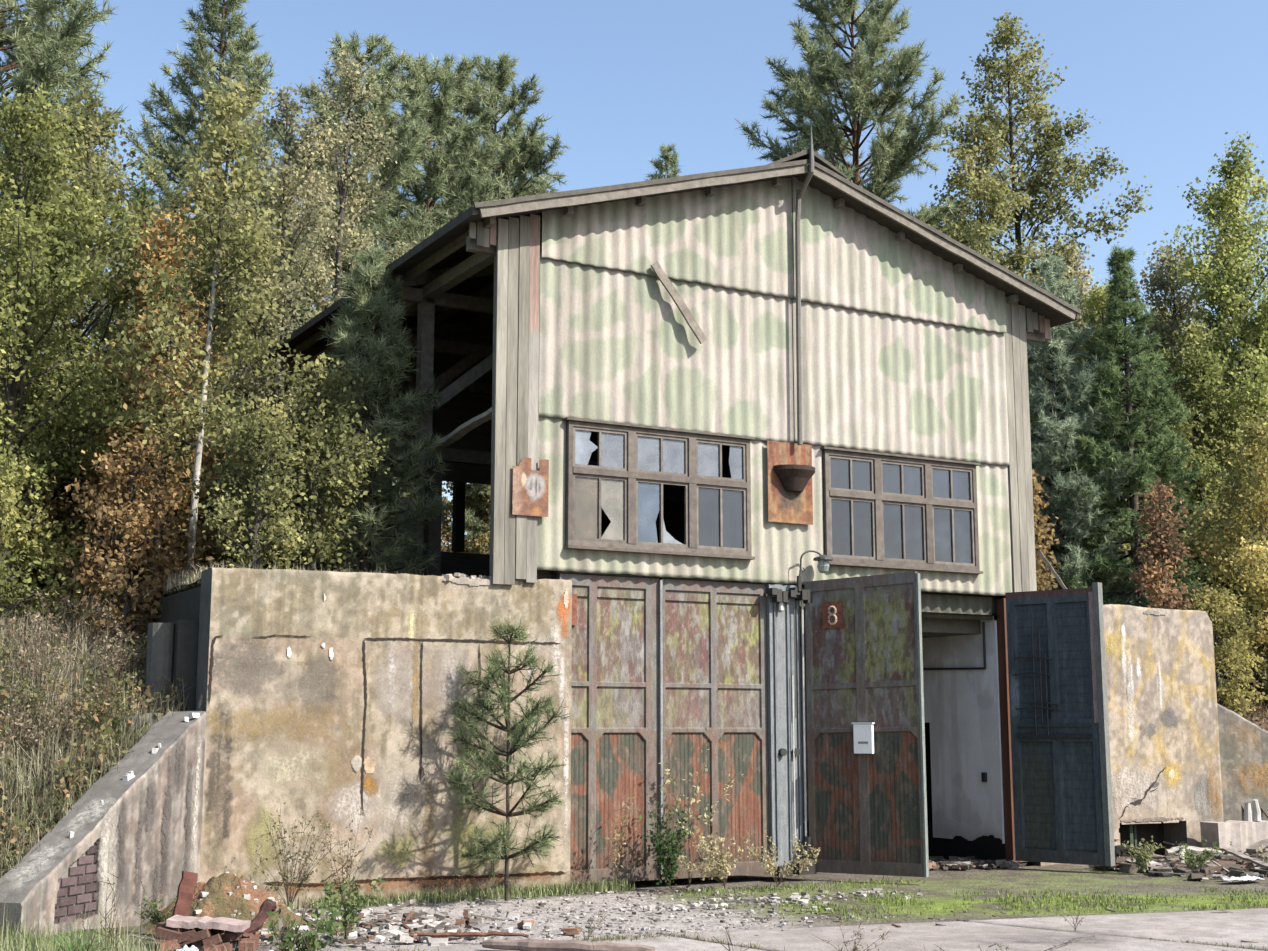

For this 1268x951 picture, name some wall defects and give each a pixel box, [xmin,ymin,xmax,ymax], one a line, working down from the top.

damp [116,659,377,904]
damp [212,639,282,693]
damp [408,610,419,721]
damp [527,625,569,832]
crack [1114,767,1166,841]
damp [1109,626,1179,736]
flaking render [54,813,114,924]